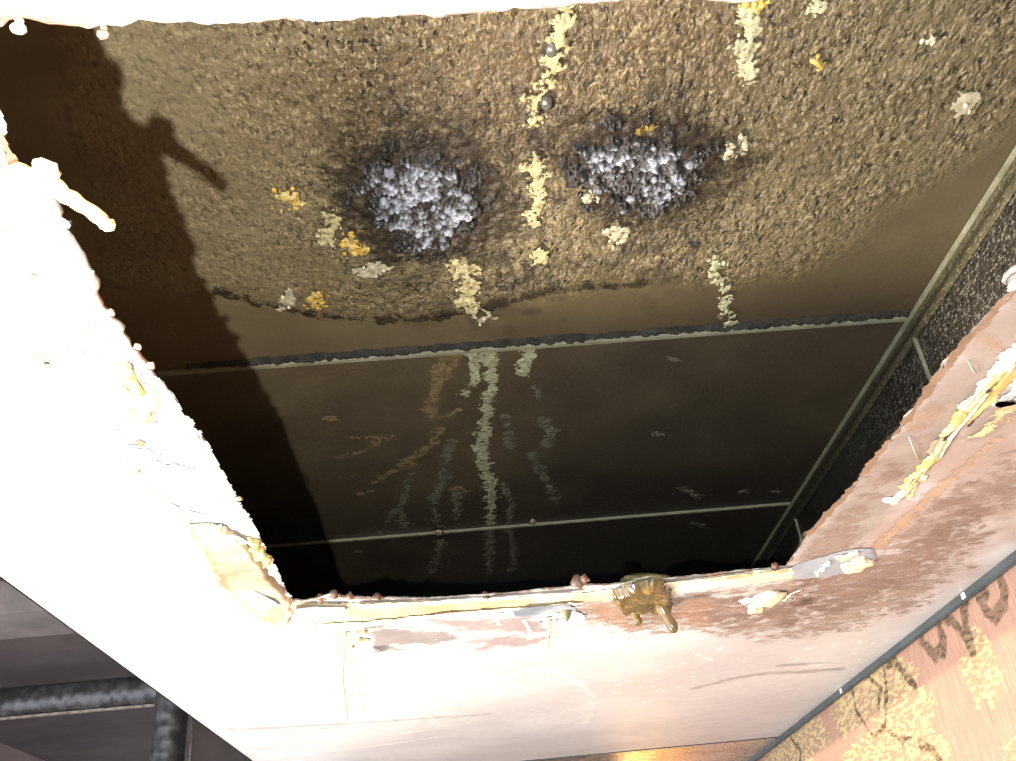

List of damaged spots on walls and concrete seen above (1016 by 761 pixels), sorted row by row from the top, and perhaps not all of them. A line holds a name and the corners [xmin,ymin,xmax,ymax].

peeling [24,194,72,242]
peeling [805,294,1016,559]
damp [356,349,562,575]
peeling [246,537,274,569]
peeling [738,597,764,615]